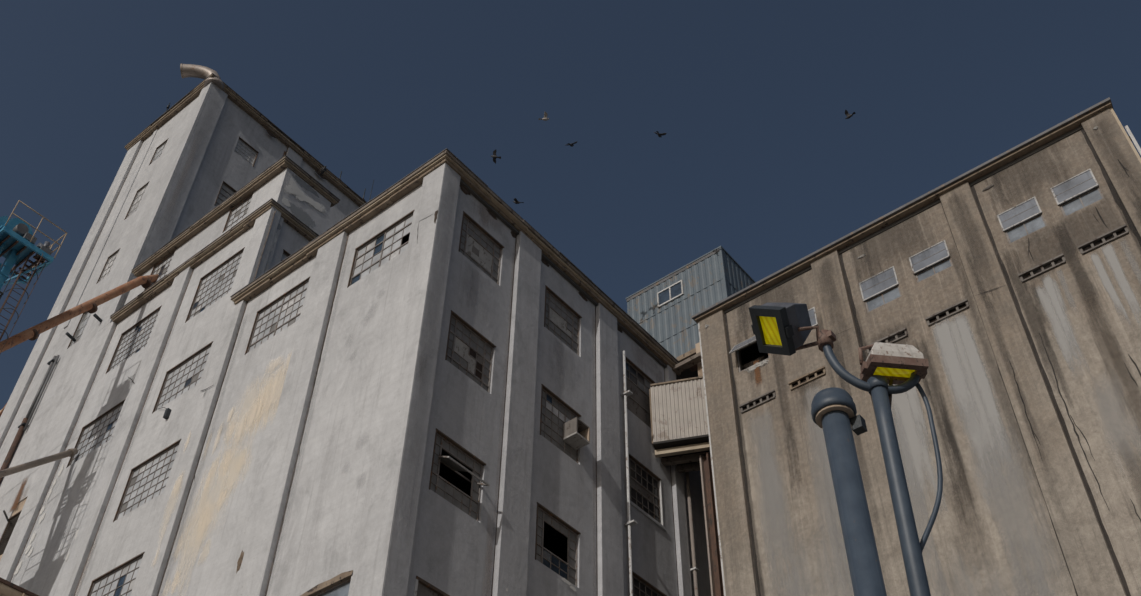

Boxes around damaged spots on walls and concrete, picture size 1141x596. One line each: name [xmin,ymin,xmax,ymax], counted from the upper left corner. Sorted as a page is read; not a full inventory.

water stain [1037,276,1080,362]
water stain [1091,245,1140,322]
water stain [888,384,937,500]
water stain [935,316,1011,493]
crack [1009,361,1042,459]
crack [1039,333,1141,522]